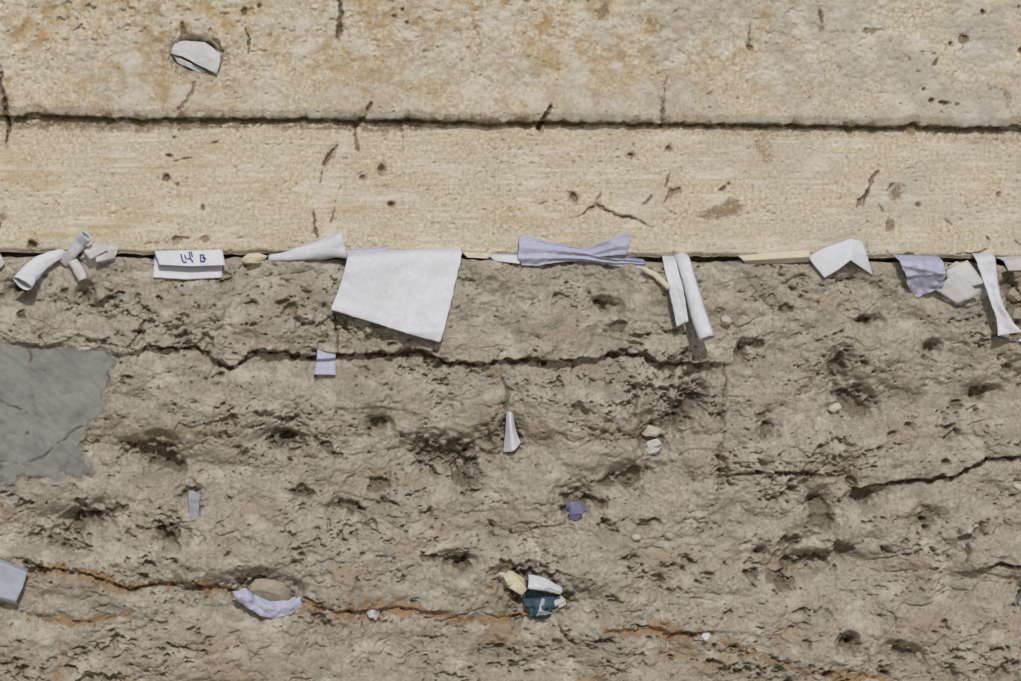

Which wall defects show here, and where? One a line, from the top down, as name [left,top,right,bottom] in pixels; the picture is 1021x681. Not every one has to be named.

crack [125,313,1016,491]
corrosion [22,559,234,601]
corrosion [27,609,133,628]
corrosion [293,594,530,627]